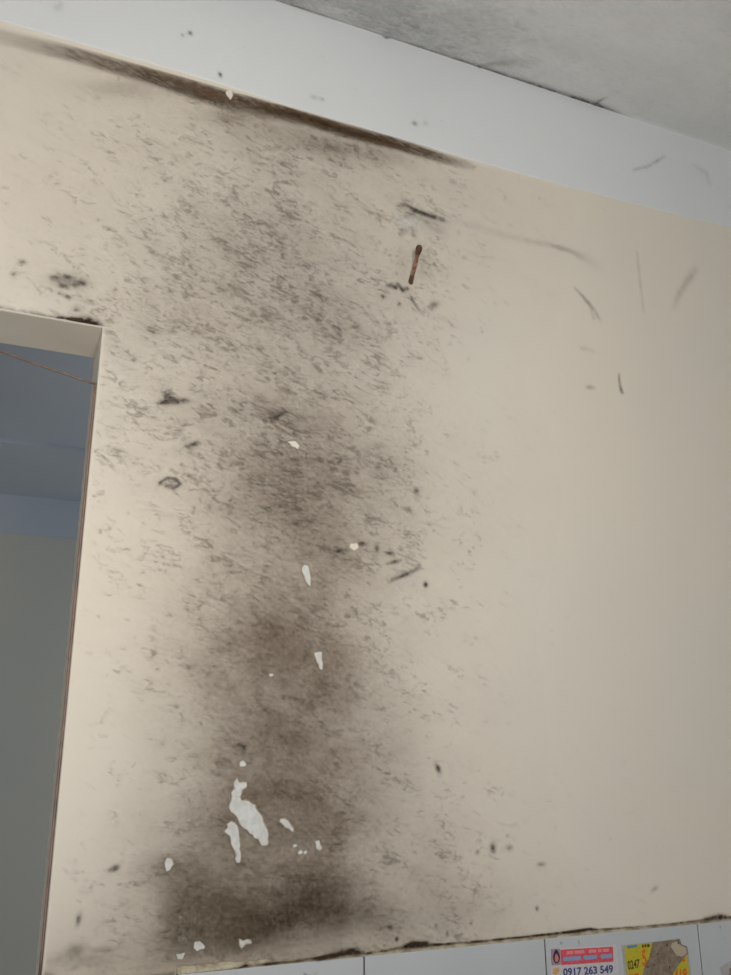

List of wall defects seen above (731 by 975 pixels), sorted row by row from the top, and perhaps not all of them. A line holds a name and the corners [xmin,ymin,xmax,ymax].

leakage [68,50,446,159]
leakage [55,316,99,325]
peeling [301,564,312,587]
peeling [313,651,324,671]
peeling [224,760,270,863]
peeling [279,817,322,855]
peeling [163,856,174,872]
leakage [198,780,353,946]
peeling [176,941,205,959]